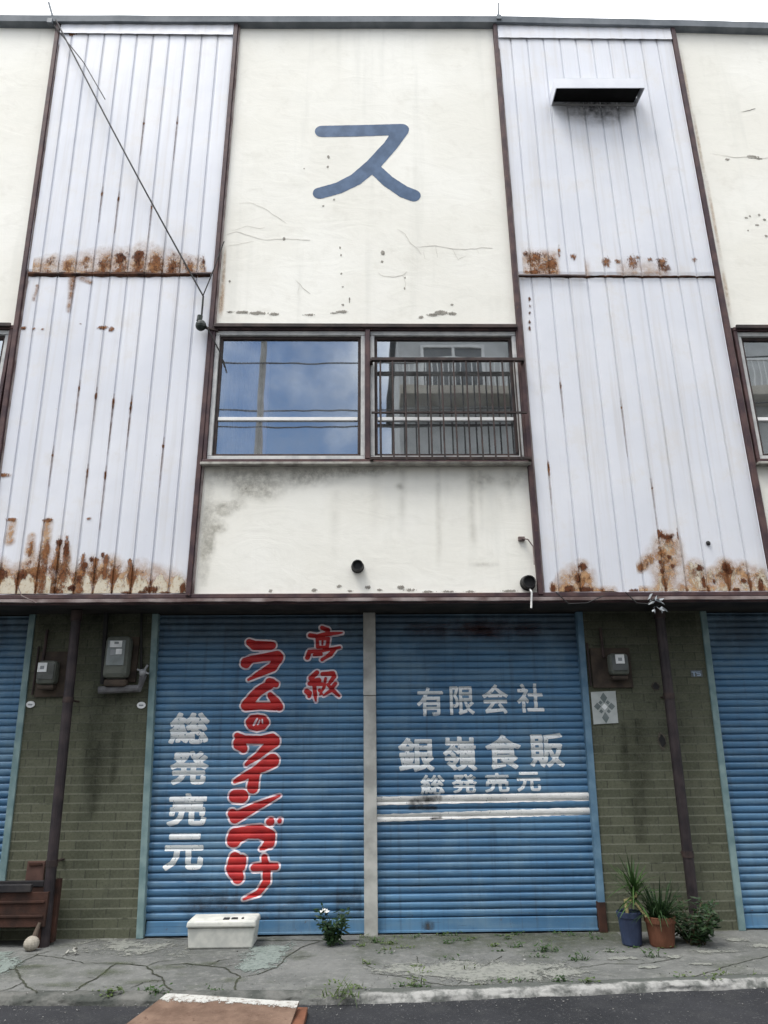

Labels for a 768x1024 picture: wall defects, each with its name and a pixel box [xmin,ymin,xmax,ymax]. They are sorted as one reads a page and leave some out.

crack [227,203,301,246]
corrosion [28,250,211,312]
corrosion [519,247,715,279]
corrosion [0,518,186,594]
corrosion [550,562,614,592]
corrosion [629,537,768,591]
crack [0,937,353,993]
crack [364,956,502,986]